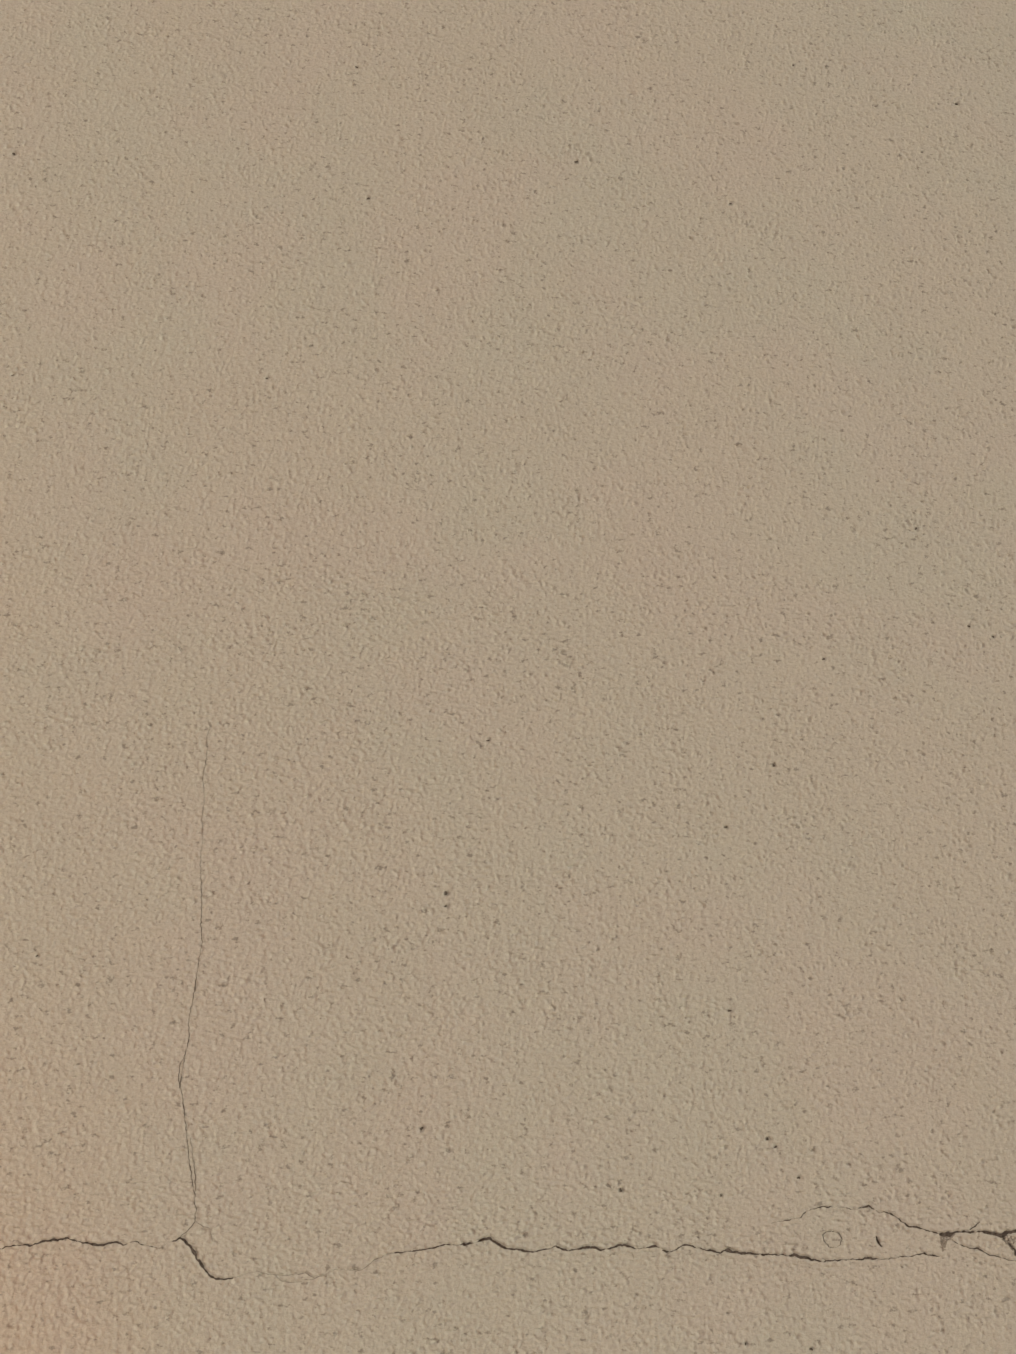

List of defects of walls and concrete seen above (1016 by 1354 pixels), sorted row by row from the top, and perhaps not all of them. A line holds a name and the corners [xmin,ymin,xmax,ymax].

crack [2,725,1016,1283]